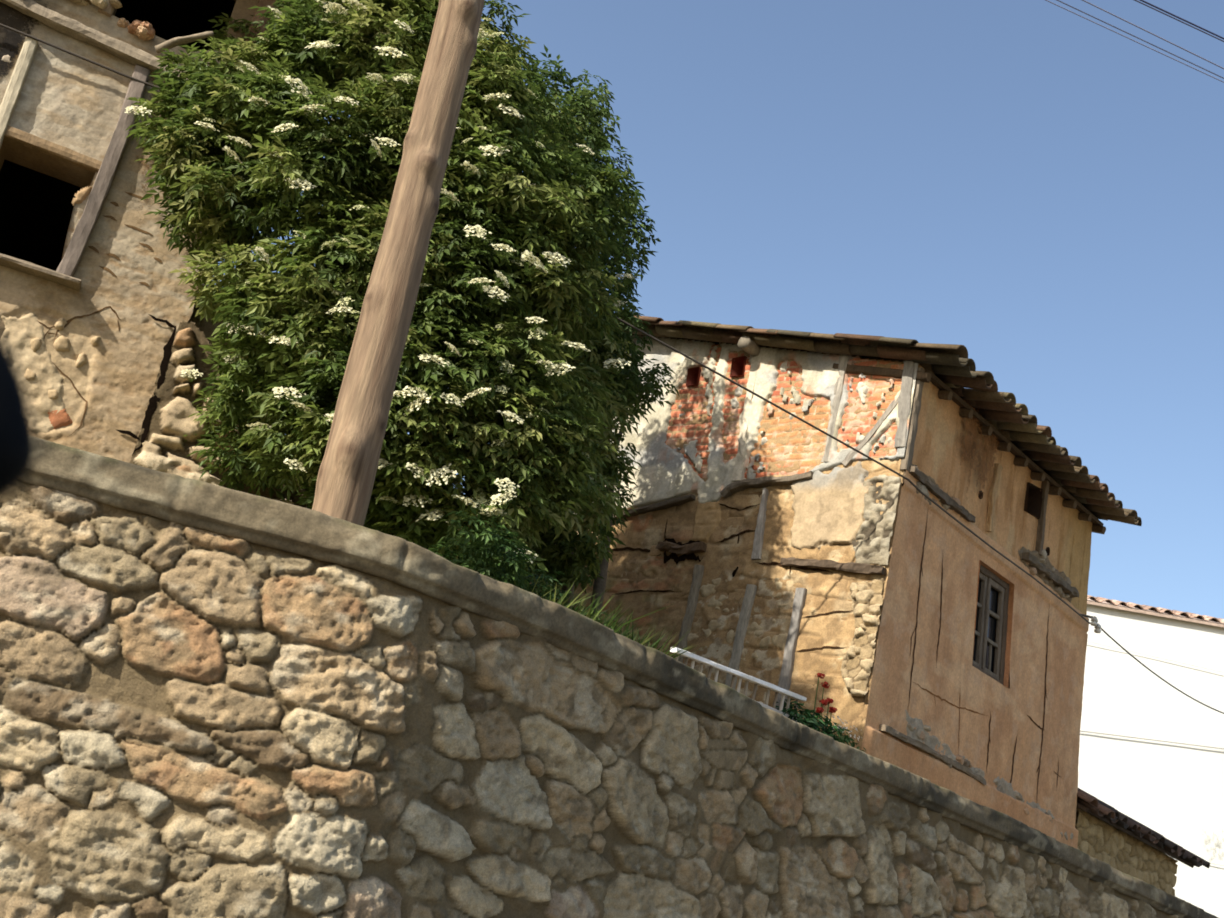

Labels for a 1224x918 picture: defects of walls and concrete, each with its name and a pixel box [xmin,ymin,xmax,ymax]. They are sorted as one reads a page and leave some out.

damp [0,2,47,80]
crack [38,306,176,456]
flaking render [665,345,965,697]
crack [908,513,1060,808]
spalling [905,710,1055,821]